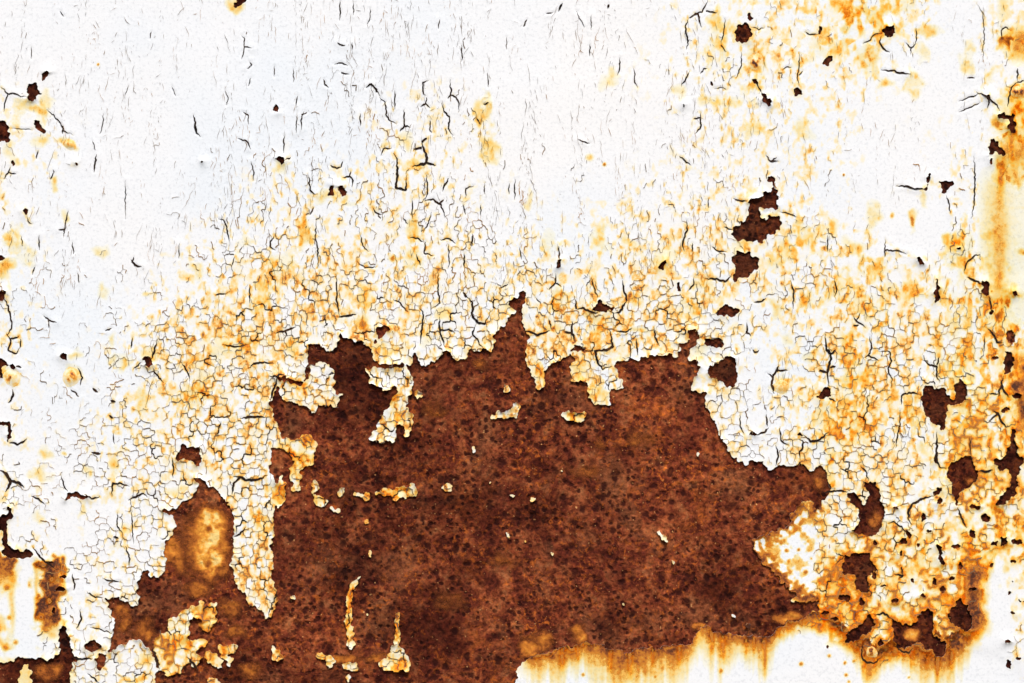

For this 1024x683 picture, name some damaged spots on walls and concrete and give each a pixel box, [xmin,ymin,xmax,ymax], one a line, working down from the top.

crack [680,0,742,89]
crack [826,1,920,155]
crack [954,5,1024,139]
crack [0,0,192,377]
crack [0,454,68,512]
peeling [0,291,839,683]
rust [948,399,1007,518]
rust [0,553,17,589]
rust [33,554,67,631]
crack [68,604,215,683]
rust [164,504,247,637]
rust [518,502,991,679]